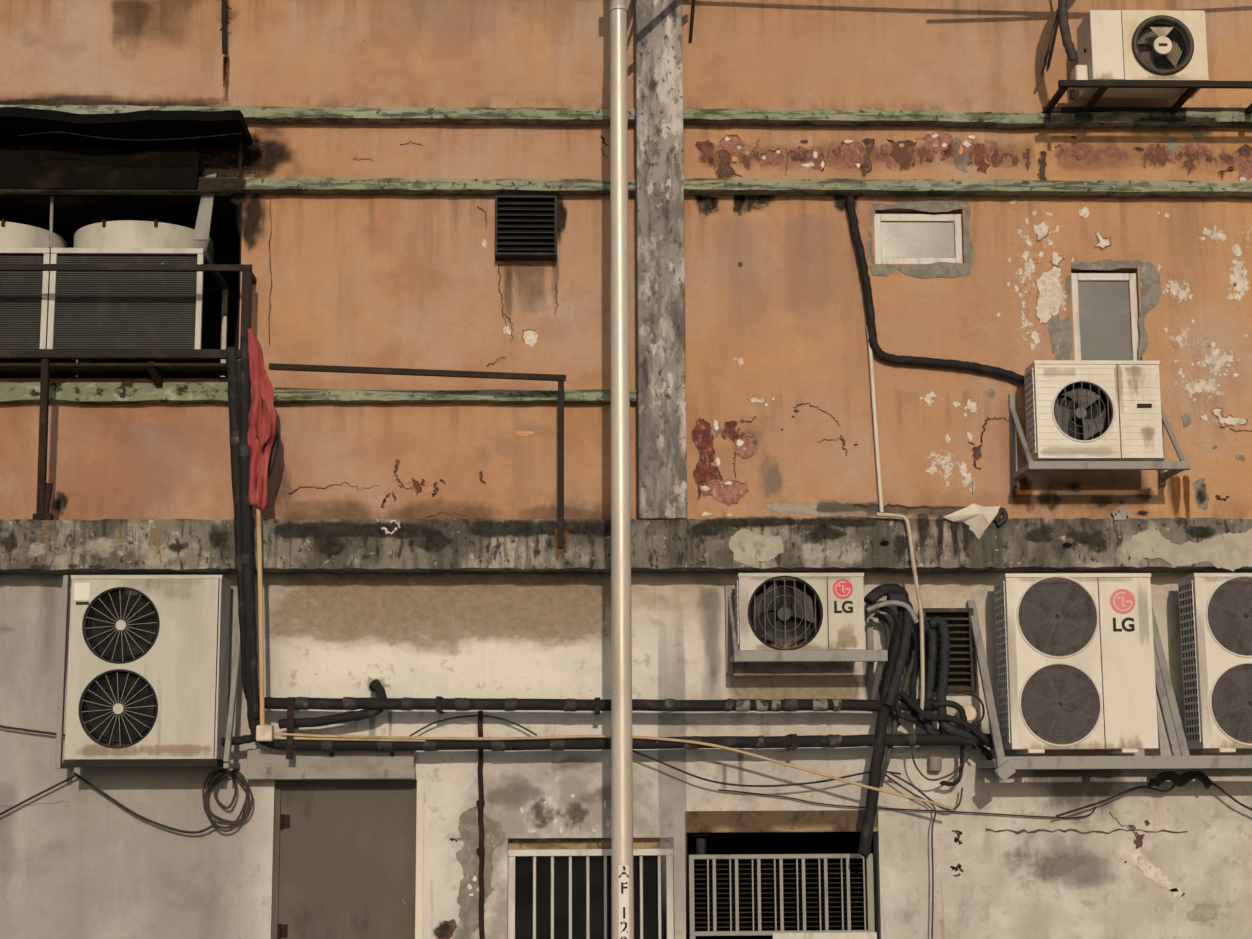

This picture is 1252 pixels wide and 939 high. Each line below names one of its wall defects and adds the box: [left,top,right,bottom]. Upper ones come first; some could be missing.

damp [0,134,290,248]
peeling [694,129,1252,181]
peeling [1007,199,1074,354]
crack [487,264,513,367]
crack [287,482,380,494]
damp [471,520,611,537]
peeling [691,396,774,507]
damp [691,501,885,543]
crack [781,403,858,456]
crack [969,417,1009,470]
damp [273,573,611,646]
peeling [433,806,506,939]